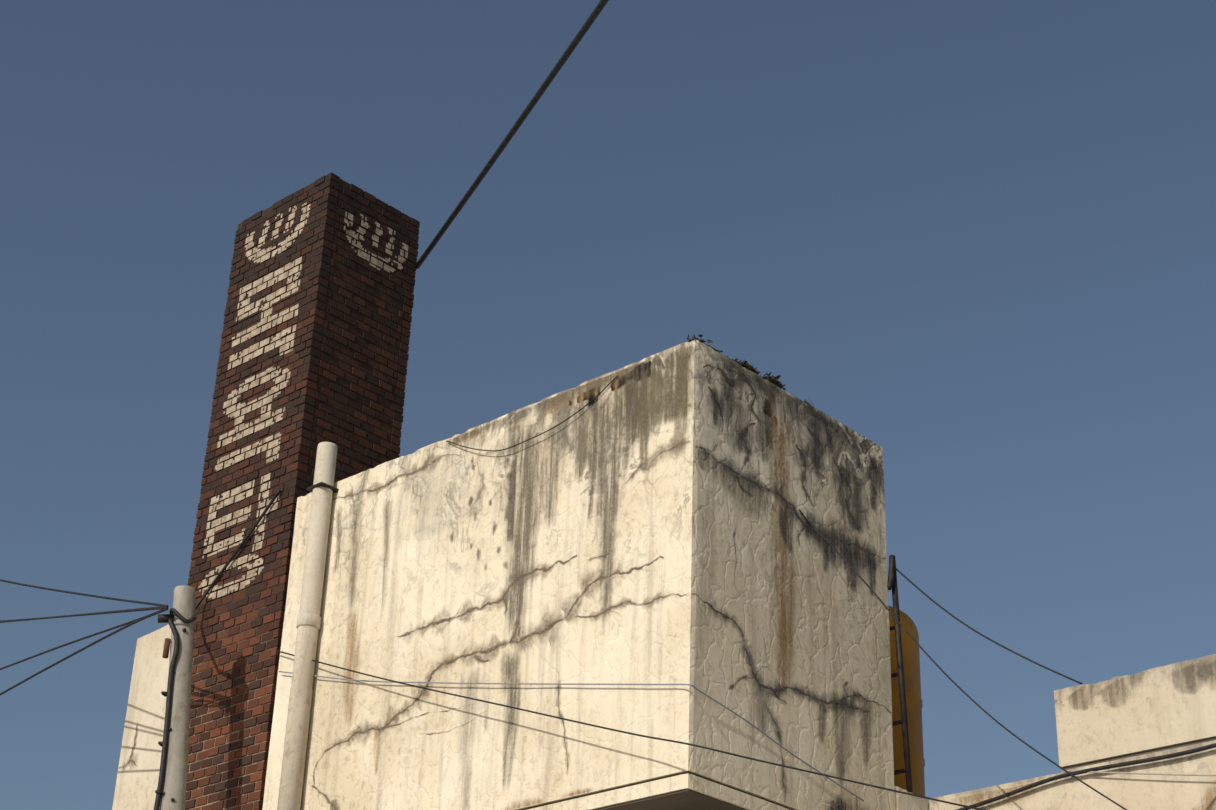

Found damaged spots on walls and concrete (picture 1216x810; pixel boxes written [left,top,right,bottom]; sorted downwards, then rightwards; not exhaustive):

crack [333,454,456,500]
damp [456,349,693,625]
crack [626,365,886,559]
damp [780,458,877,594]
damp [503,656,519,783]
crack [312,553,891,810]
damp [820,701,844,778]